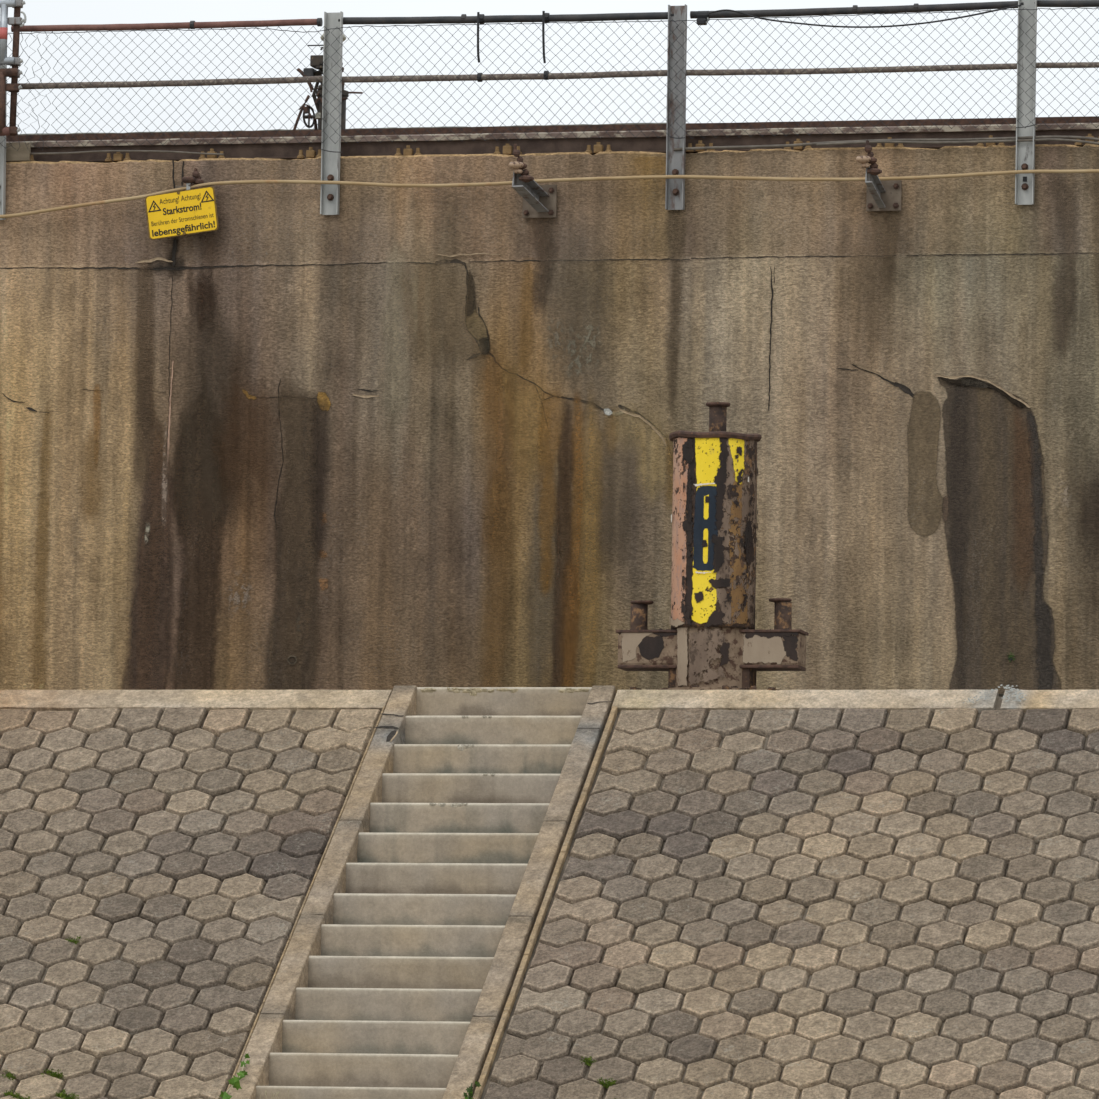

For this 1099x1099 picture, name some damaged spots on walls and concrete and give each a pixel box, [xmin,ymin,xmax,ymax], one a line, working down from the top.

crack [172,160,184,189]
leakage [122,241,257,690]
crack [256,379,284,525]
leakage [267,388,326,690]
crack [0,238,1098,462]
rust [565,398,598,687]
rust [626,419,799,661]
rust [720,639,730,666]
spalling [935,375,1031,408]
leakage [907,377,1061,694]